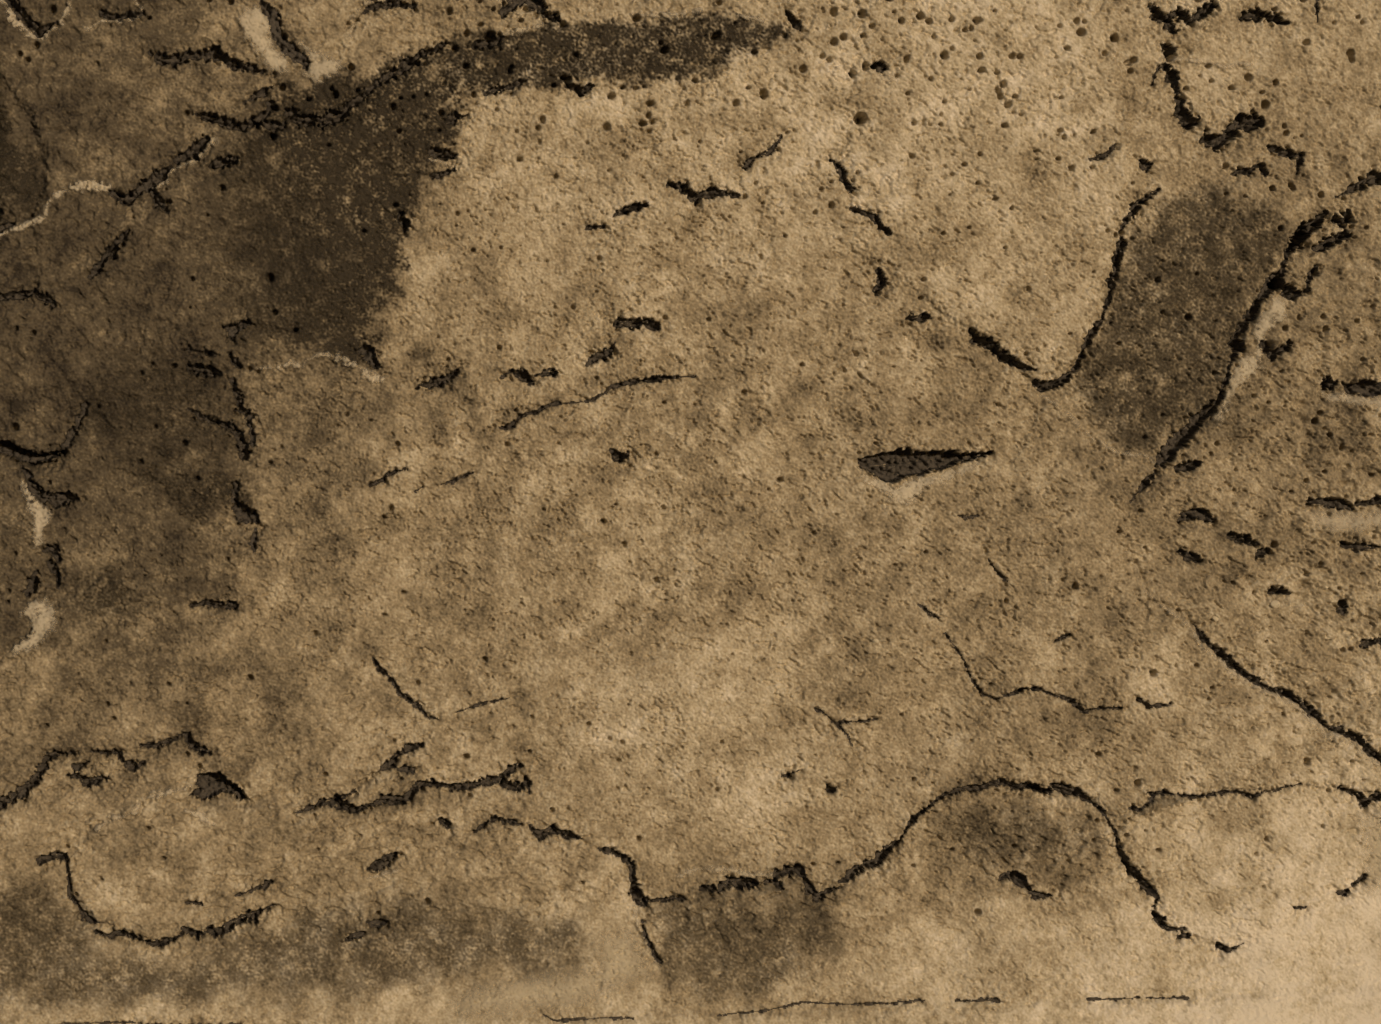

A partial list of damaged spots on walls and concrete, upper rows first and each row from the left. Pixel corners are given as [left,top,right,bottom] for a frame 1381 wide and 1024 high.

water stain [0,105,48,224]
crack [87,0,505,279]
crack [968,187,1161,392]
water stain [1083,186,1286,448]
crack [1129,170,1381,504]
water stain [152,470,250,522]
spalling [858,448,993,505]
water stain [78,565,134,613]
crack [0,732,212,809]
crack [36,852,277,947]
crack [295,657,1303,964]
crack [1193,624,1381,809]